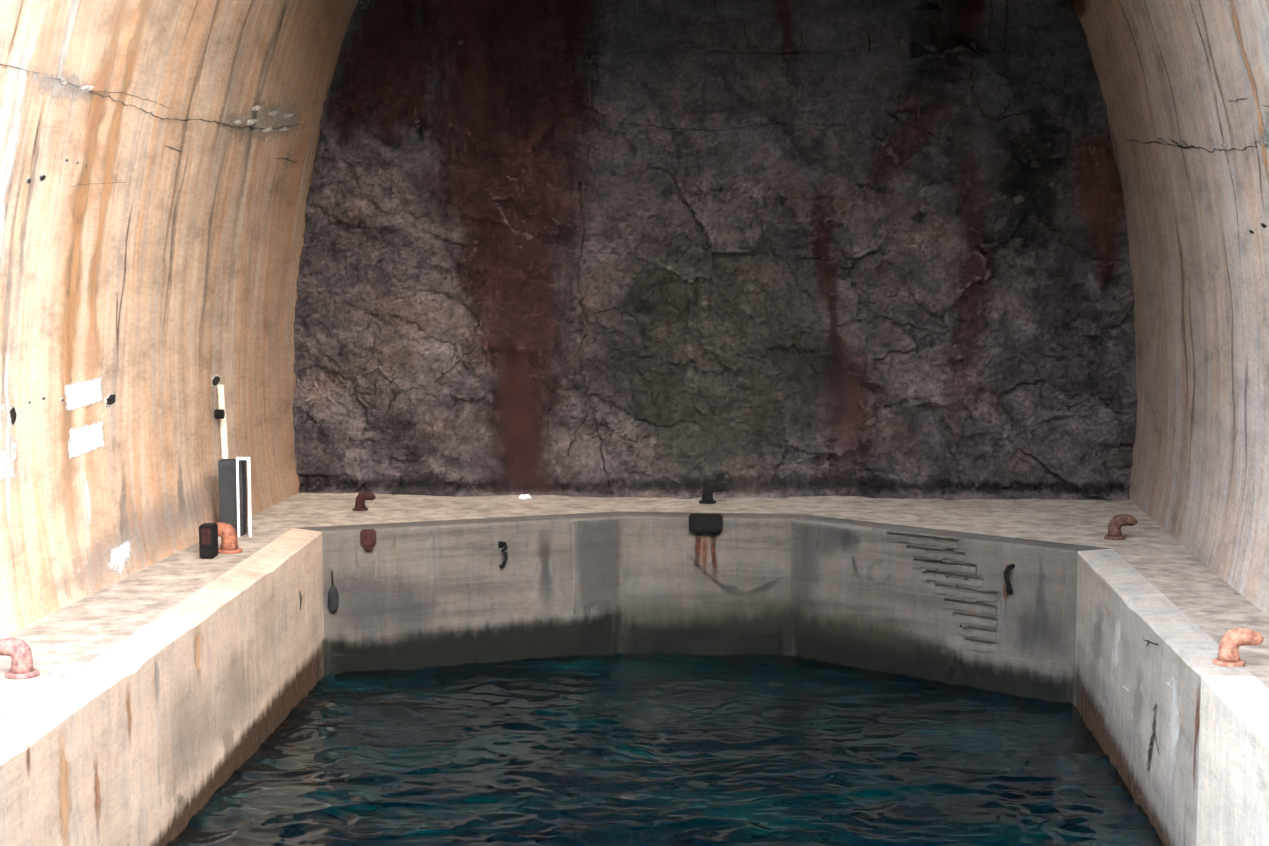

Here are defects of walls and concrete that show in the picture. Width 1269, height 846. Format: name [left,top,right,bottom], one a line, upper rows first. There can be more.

crack [970,0,1050,123]
crack [0,64,302,163]
spalling [229,101,302,139]
crack [639,113,825,131]
crack [1125,137,1263,153]
crack [568,182,646,494]
crack [820,294,934,333]
crack [361,345,476,424]
corrosion [695,534,717,571]
water stain [623,609,1174,846]